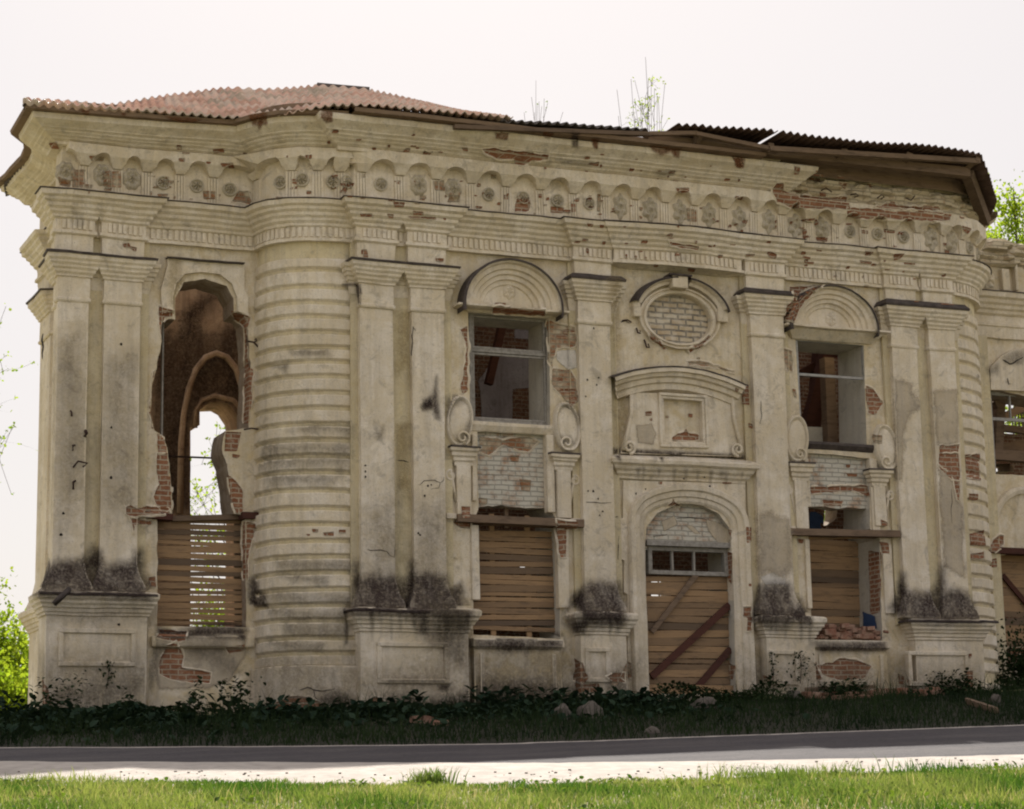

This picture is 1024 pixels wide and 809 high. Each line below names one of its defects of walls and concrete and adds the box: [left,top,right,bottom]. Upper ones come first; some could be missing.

spalling [771,166,971,323]
water stain [424,390,439,415]
peeling [458,327,529,419]
spalling [491,303,578,409]
spalling [124,369,174,536]
spalling [937,443,981,504]
water stain [38,549,149,599]
water stain [344,567,470,633]
water stain [574,583,626,632]
water stain [755,584,811,623]
water stain [893,575,980,622]
peeling [154,628,246,689]